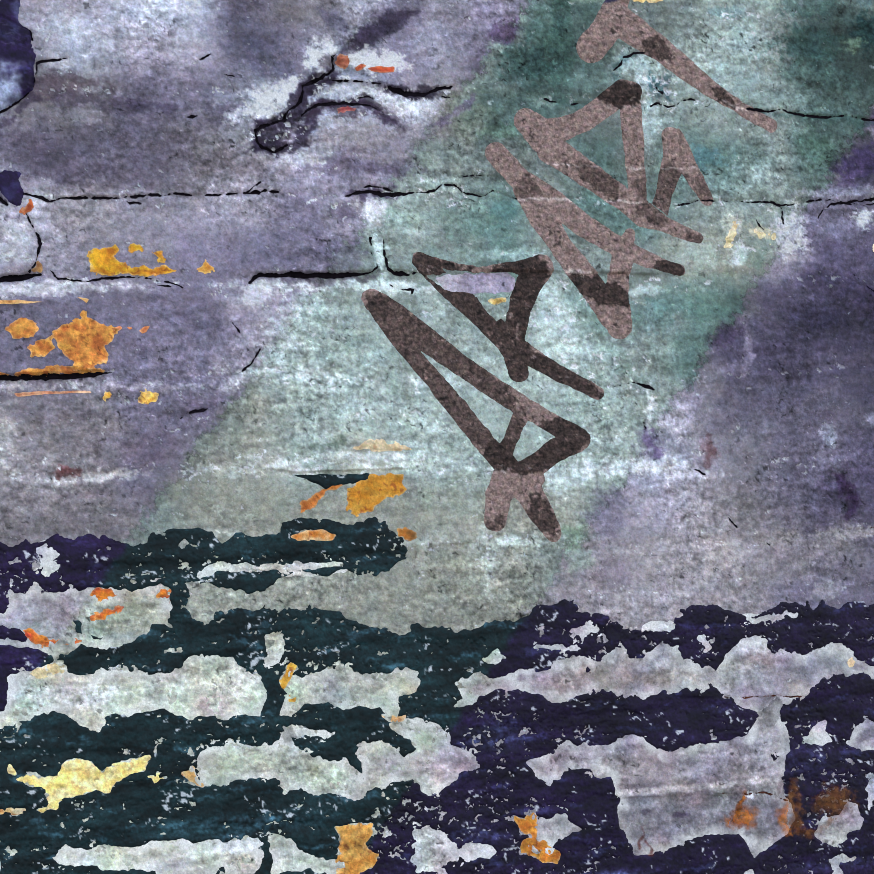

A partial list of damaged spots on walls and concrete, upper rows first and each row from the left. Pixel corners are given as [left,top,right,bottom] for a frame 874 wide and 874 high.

peeling [0,0,36,111]
crack [0,58,67,113]
crack [254,54,453,153]
crack [650,87,710,108]
crack [746,107,874,121]
peeling [0,170,34,215]
crack [0,181,279,288]
crack [345,175,494,197]
crack [678,197,874,230]
crack [248,237,417,294]
crack [0,372,112,381]
peeling [0,473,874,874]